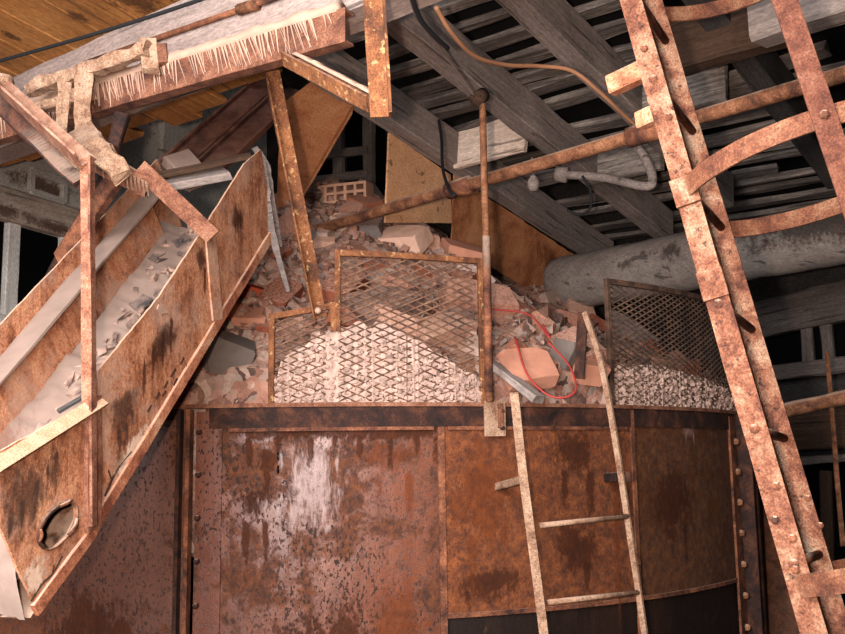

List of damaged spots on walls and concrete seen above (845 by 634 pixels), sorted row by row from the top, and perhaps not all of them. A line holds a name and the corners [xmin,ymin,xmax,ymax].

rust [232,206,243,239]
rust [197,247,206,292]
rust [142,319,176,392]
rust [113,393,133,450]
rust [5,453,58,536]
rust [240,430,437,563]
rust [552,432,594,515]
rust [458,566,518,602]
rust [558,526,595,589]
rust [273,604,359,634]